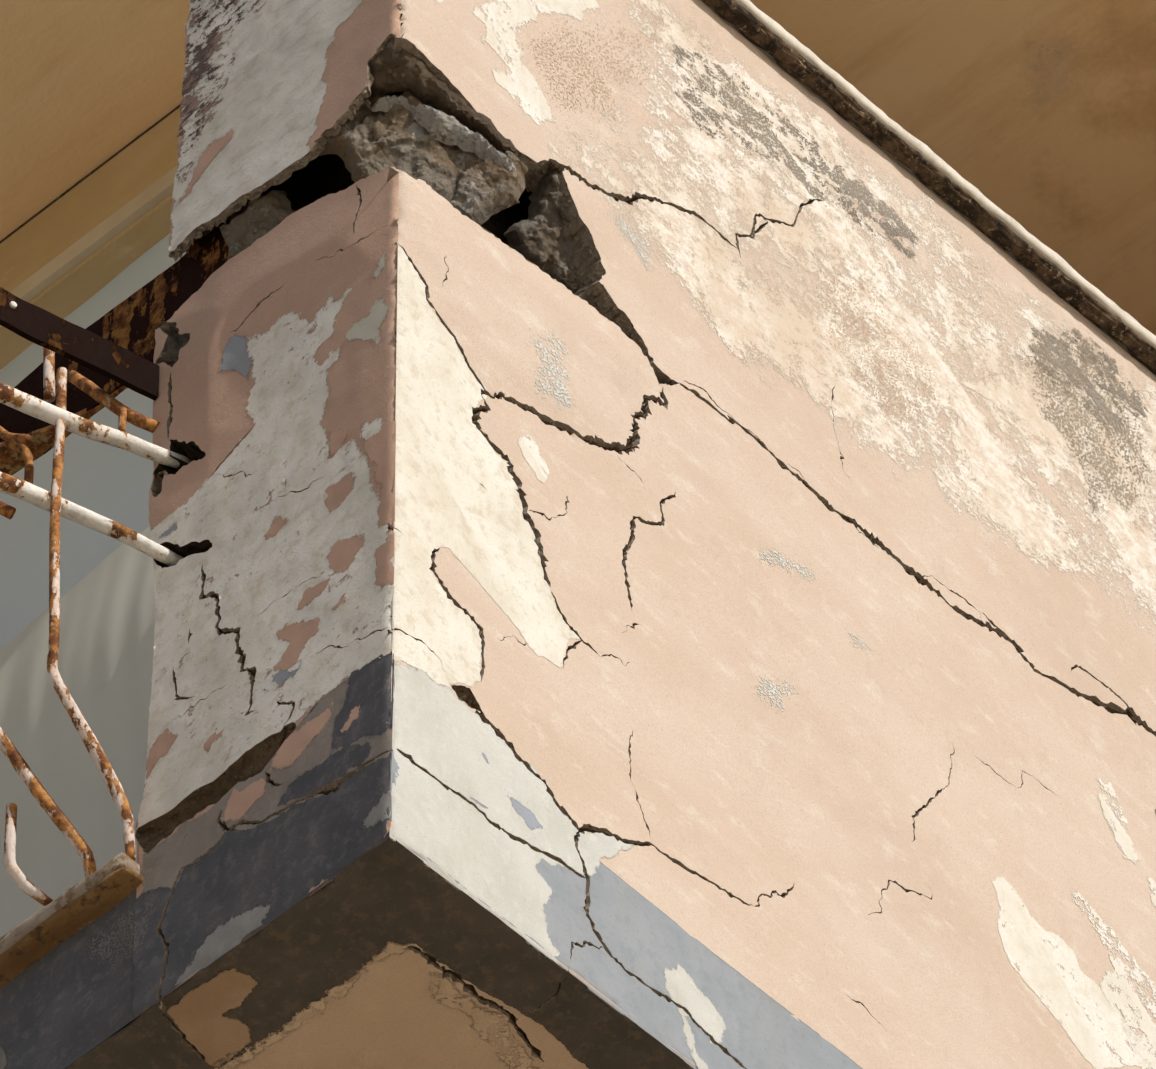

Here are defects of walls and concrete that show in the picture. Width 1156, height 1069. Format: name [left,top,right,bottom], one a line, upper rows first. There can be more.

crack [547,161,822,257]
leakage [673,45,919,264]
peeling [168,0,1156,638]
crack [316,186,1156,736]
leakage [818,269,940,430]
leakage [1017,325,1156,535]
crack [173,565,295,729]
peeling [135,245,639,965]
peeling [167,904,409,1069]
crack [157,709,794,1069]
crack [912,742,1058,841]
peeling [992,875,1156,1069]